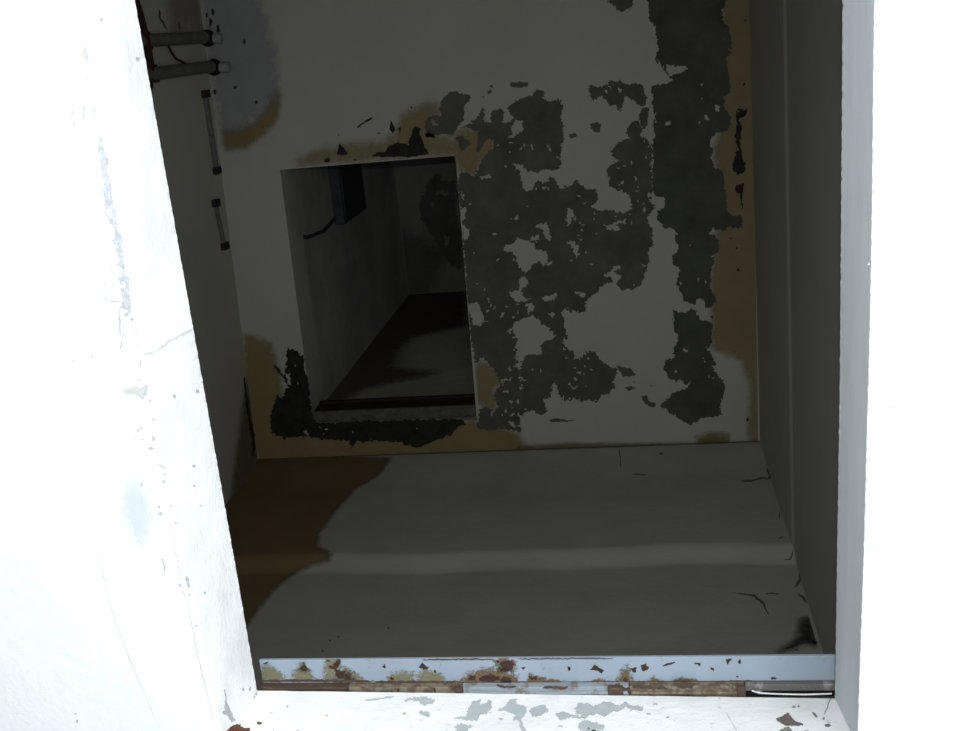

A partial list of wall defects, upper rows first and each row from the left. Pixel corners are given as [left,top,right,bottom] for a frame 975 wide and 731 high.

leakage [223,93,279,149]
peeling [97,137,138,350]
peeling [419,0,747,432]
rust [259,657,754,697]
peeling [454,698,658,731]